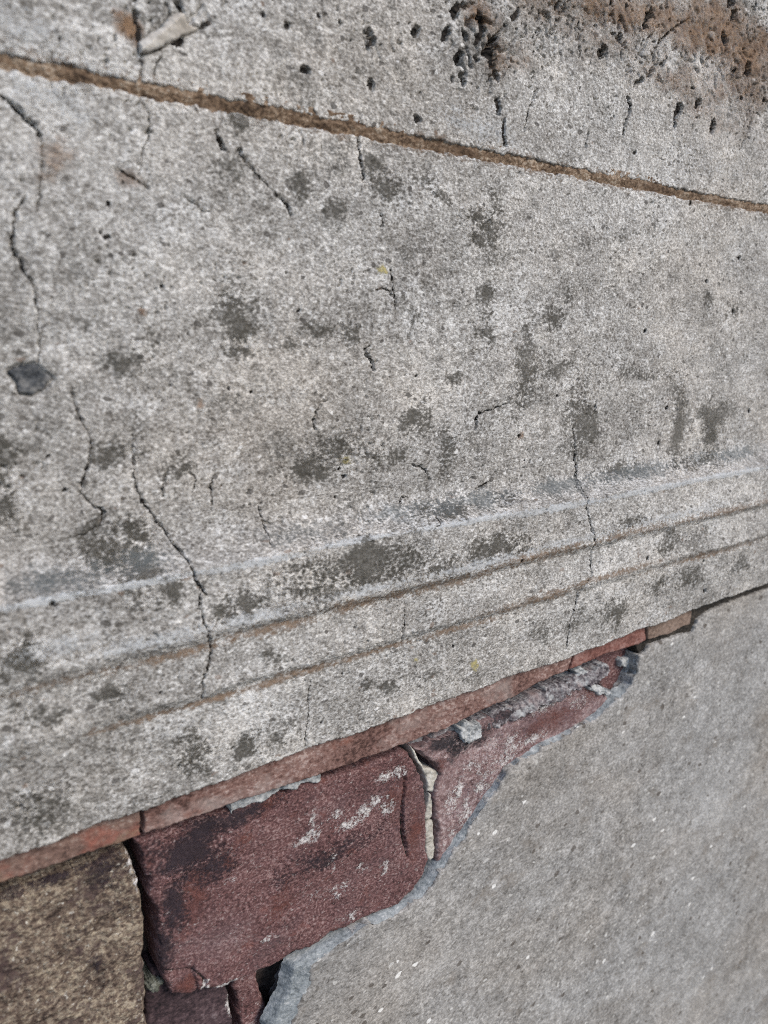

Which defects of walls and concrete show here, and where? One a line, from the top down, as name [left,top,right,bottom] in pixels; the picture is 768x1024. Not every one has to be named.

crack [0,94,43,364]
crack [63,388,103,540]
crack [132,434,211,699]
flaking render [259,647,647,1024]